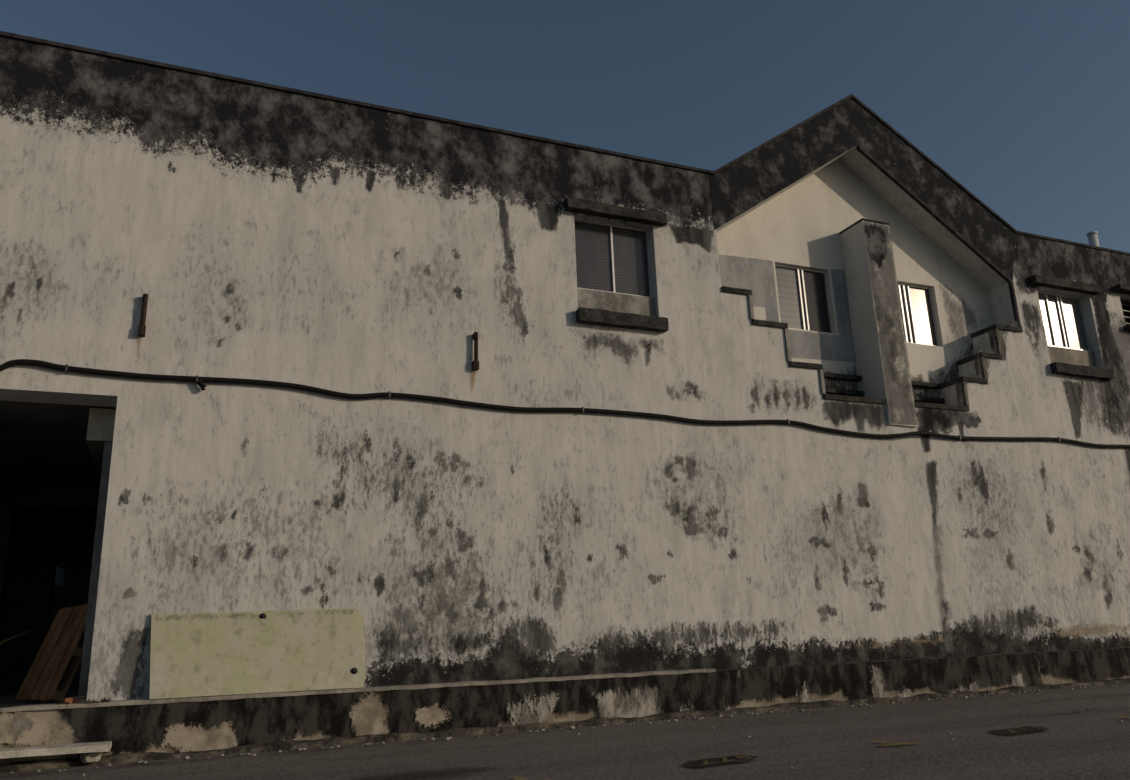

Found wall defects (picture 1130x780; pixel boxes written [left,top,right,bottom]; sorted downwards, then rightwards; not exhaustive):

leakage [0,36,1130,453]
leakage [55,460,1130,754]